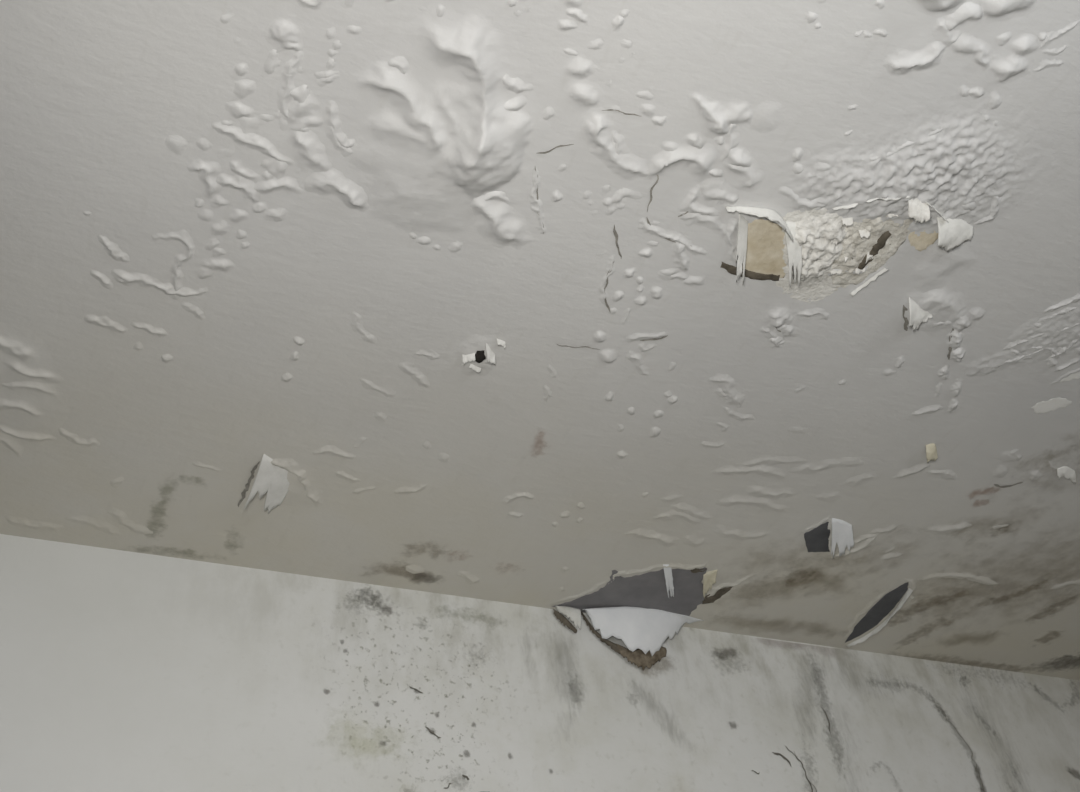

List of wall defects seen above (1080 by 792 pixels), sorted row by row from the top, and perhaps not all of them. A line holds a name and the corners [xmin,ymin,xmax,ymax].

peeling [721,90,1080,416]
peeling [238,436,376,514]
peeling [799,515,880,559]
peeling [550,561,757,671]
peeling [842,578,918,647]